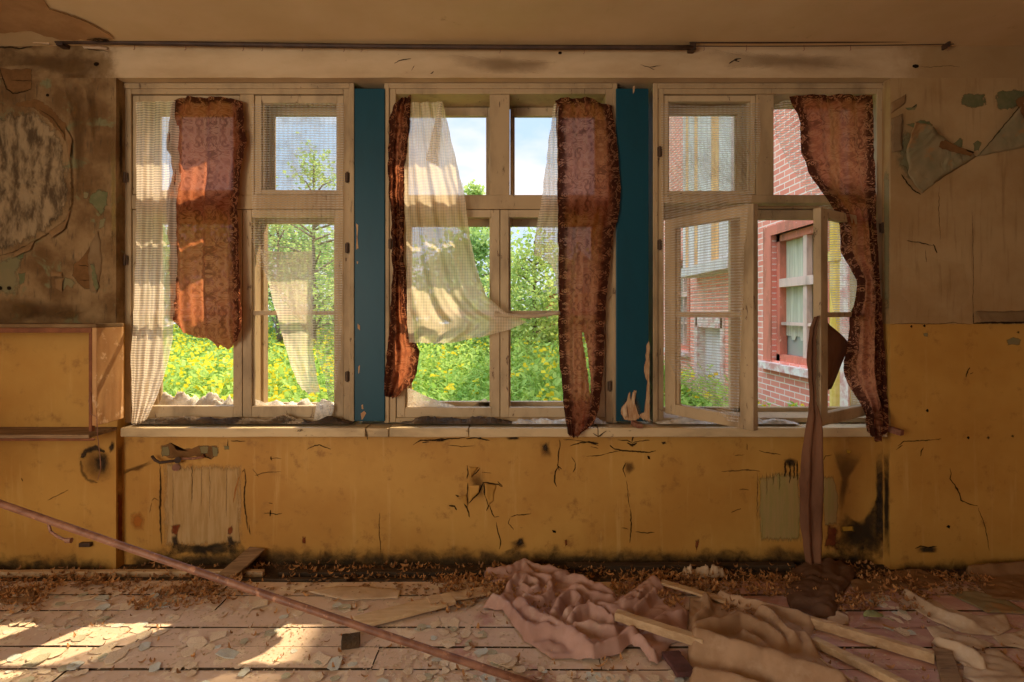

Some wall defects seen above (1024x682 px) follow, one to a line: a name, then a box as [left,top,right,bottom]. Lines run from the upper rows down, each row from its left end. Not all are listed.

spalling [0,94,108,257]
peeling [621,342,650,422]
crack [415,437,531,549]
crack [554,431,654,487]
crack [625,482,654,538]
leakage [822,462,889,565]
crack [949,470,989,548]
leakage [135,543,239,565]
leakage [250,550,805,565]